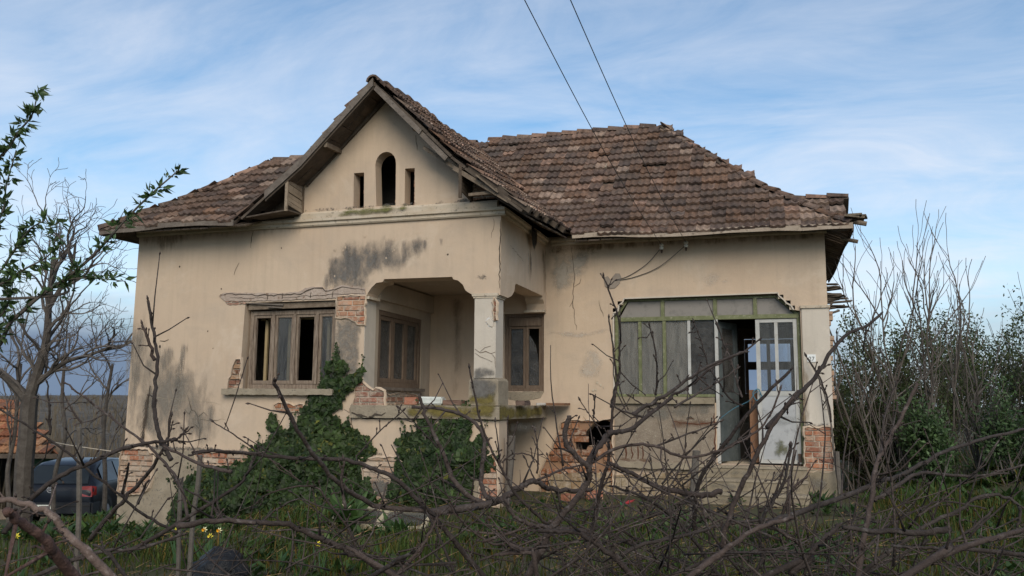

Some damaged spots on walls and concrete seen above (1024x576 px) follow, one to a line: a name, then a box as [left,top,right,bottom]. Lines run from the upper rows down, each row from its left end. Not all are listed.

leakage [322,234,422,286]
flaking render [335,294,368,326]
crack [570,247,603,330]
leakage [127,335,212,433]
flaking render [227,357,244,389]
flaking render [352,381,420,406]
flaking render [802,308,837,473]
flaking render [116,447,156,496]
flaking render [539,418,691,496]